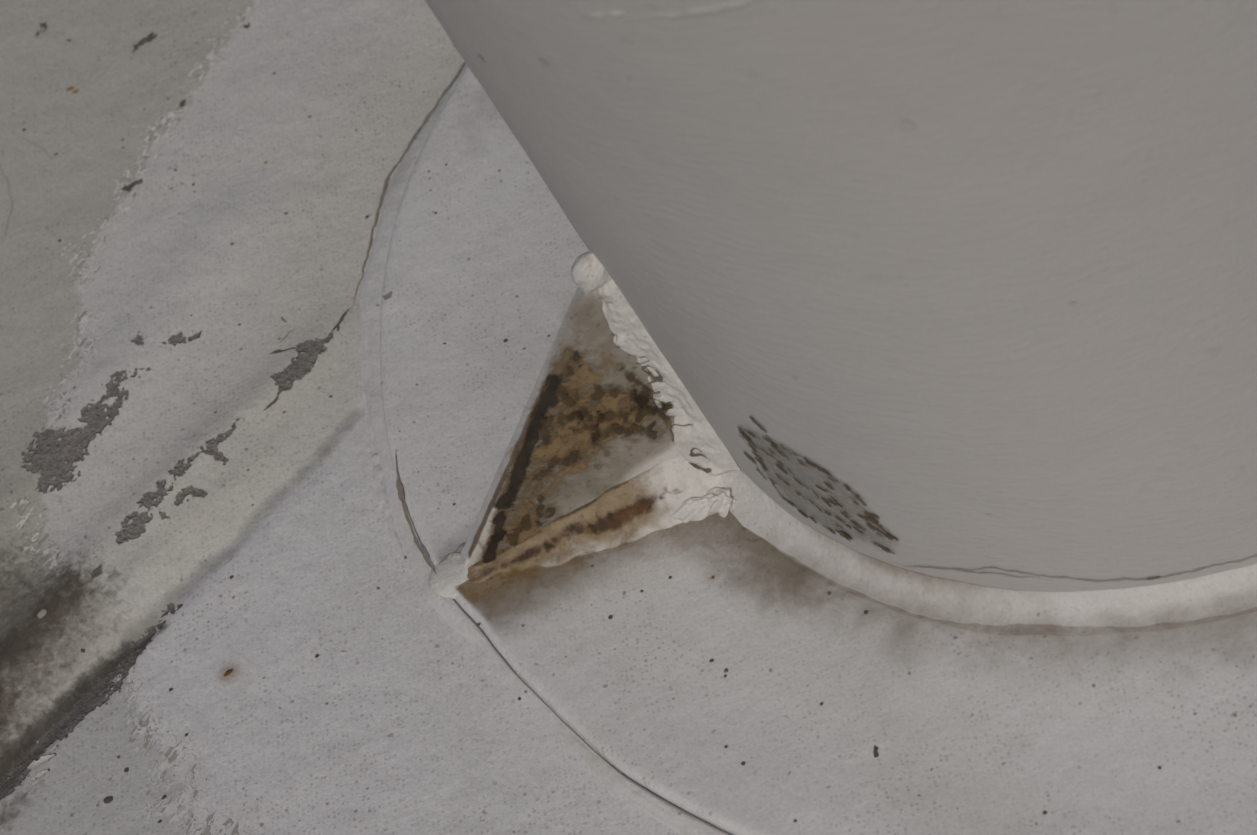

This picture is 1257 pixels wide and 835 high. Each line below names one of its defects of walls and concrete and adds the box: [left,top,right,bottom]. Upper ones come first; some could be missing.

peeling [4,0,260,580]
peeling [270,333,333,395]